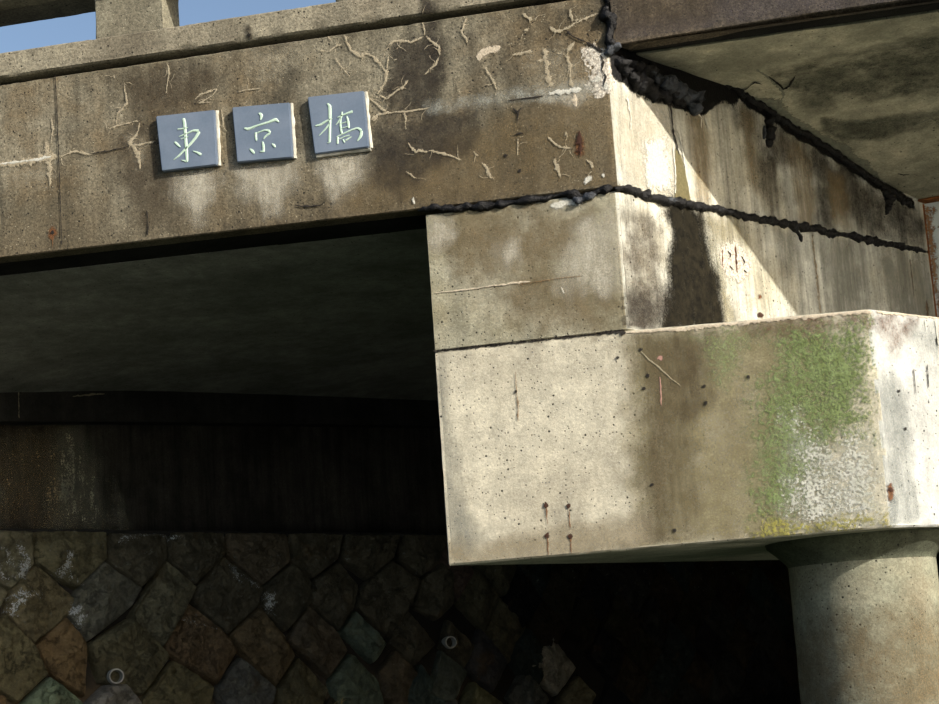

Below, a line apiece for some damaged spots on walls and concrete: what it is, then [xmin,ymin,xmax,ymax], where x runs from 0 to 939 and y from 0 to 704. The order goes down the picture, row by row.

crack [55,75,158,245]
crack [320,6,602,180]
spalling [580,42,614,98]
crack [670,106,690,200]
leakage [431,96,918,562]
rust [925,207,939,317]